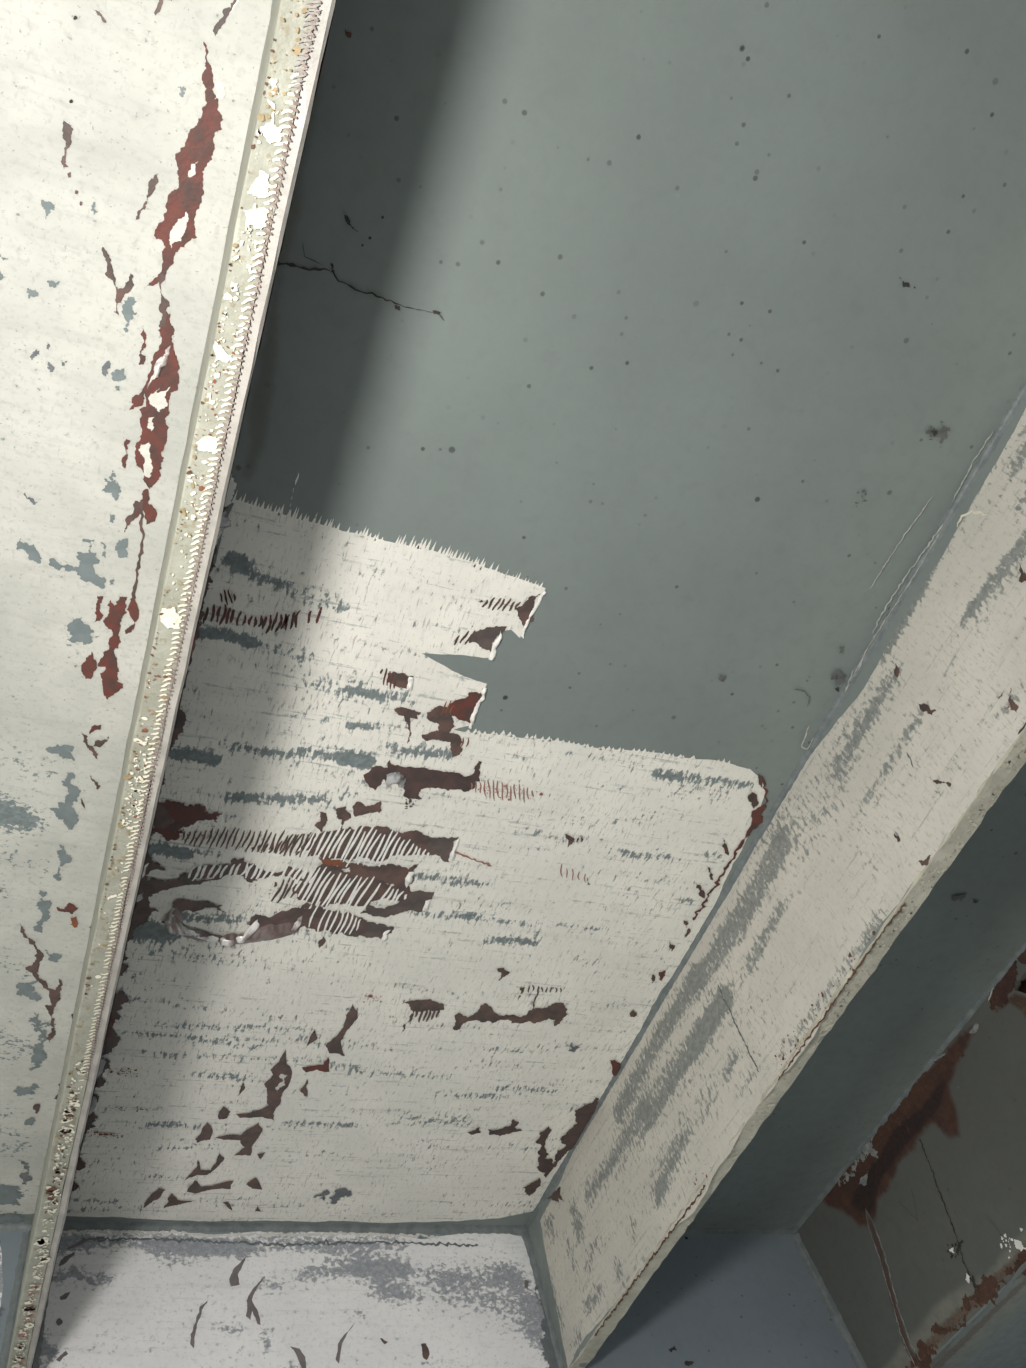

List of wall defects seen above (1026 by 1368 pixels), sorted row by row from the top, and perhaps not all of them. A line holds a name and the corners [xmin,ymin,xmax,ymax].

crack [278,245,443,320]
crack [344,215,384,247]
peeling [0,0,559,1368]
rust [52,0,567,1210]
peeling [66,408,1026,1368]
rust [594,1167,711,1336]
rust [775,903,905,1080]
rust [821,949,1026,1368]